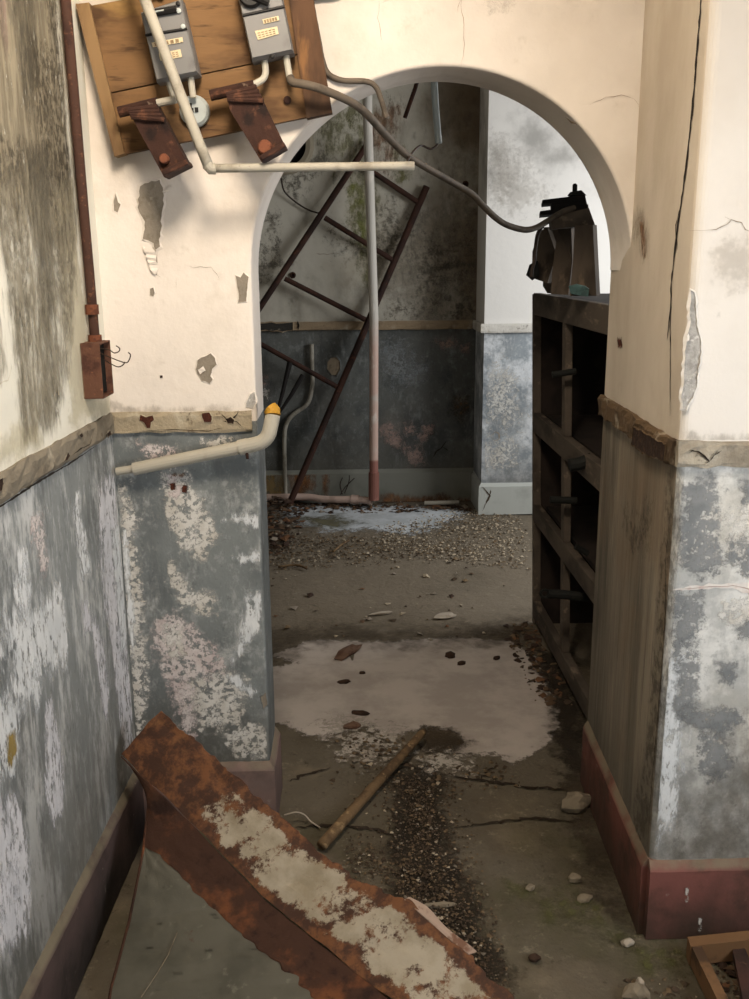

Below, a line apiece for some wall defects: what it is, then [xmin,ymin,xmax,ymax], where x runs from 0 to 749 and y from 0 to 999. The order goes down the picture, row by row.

damp [0,0,77,441]
peeling [135,178,171,275]
peeling [195,352,218,385]
peeling [235,272,250,304]
peeling [679,288,703,411]
crack [667,0,749,376]
damp [0,794,31,953]
damp [0,516,68,827]
damp [73,467,267,759]
crack [440,767,563,790]
crack [439,816,585,830]
efflorescence [657,654,686,840]